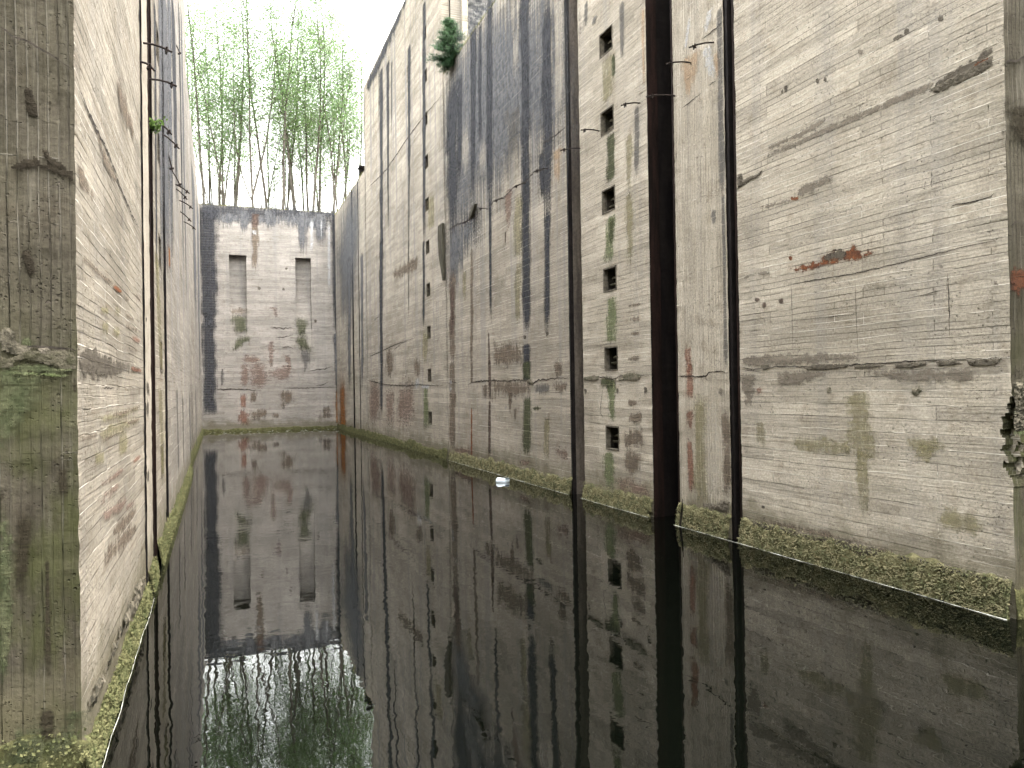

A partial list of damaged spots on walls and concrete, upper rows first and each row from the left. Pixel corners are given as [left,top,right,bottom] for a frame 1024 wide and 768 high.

damp [504,152,526,243]
damp [158,0,218,464]
rust [789,245,873,272]
spalling [0,327,76,370]
crack [371,377,566,387]
rust [335,383,346,425]
spalling [1013,382,1024,431]